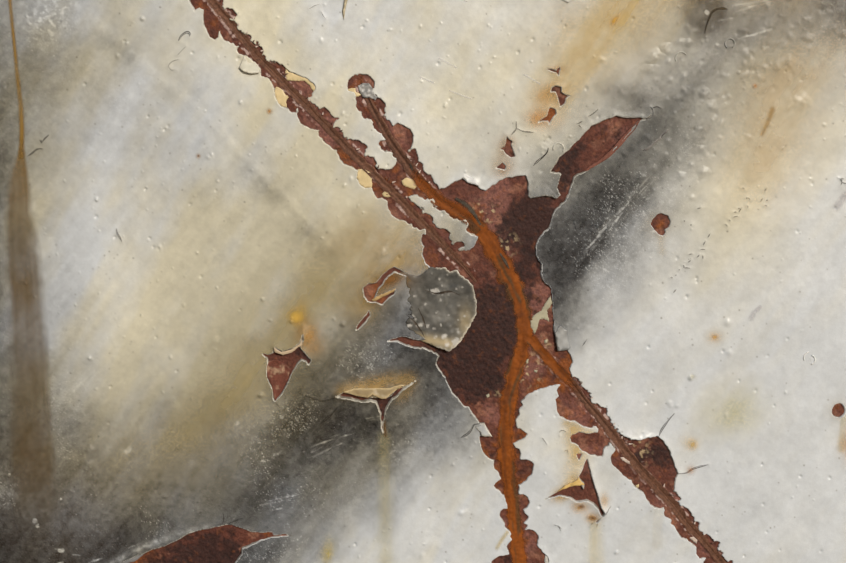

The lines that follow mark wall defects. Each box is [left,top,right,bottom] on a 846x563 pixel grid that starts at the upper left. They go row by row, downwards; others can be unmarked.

damp [9,0,28,240]
damp [11,251,37,324]
peeling [190,0,732,563]
peeling [123,514,287,563]